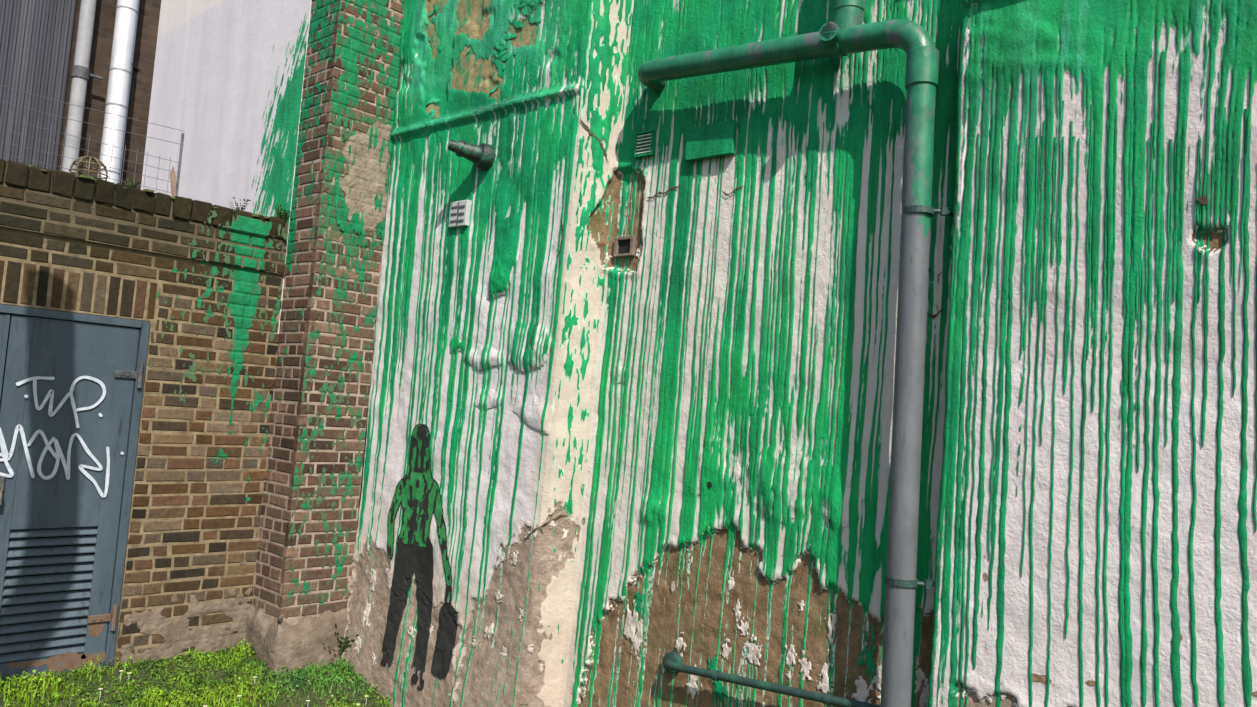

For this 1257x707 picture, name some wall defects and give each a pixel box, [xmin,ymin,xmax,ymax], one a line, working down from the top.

peeling [421,0,544,103]
peeling [423,96,440,136]
spalling [587,168,646,272]
spalling [1192,227,1228,254]
spalling [343,501,585,707]
spalling [577,527,882,707]
spalling [914,609,934,707]